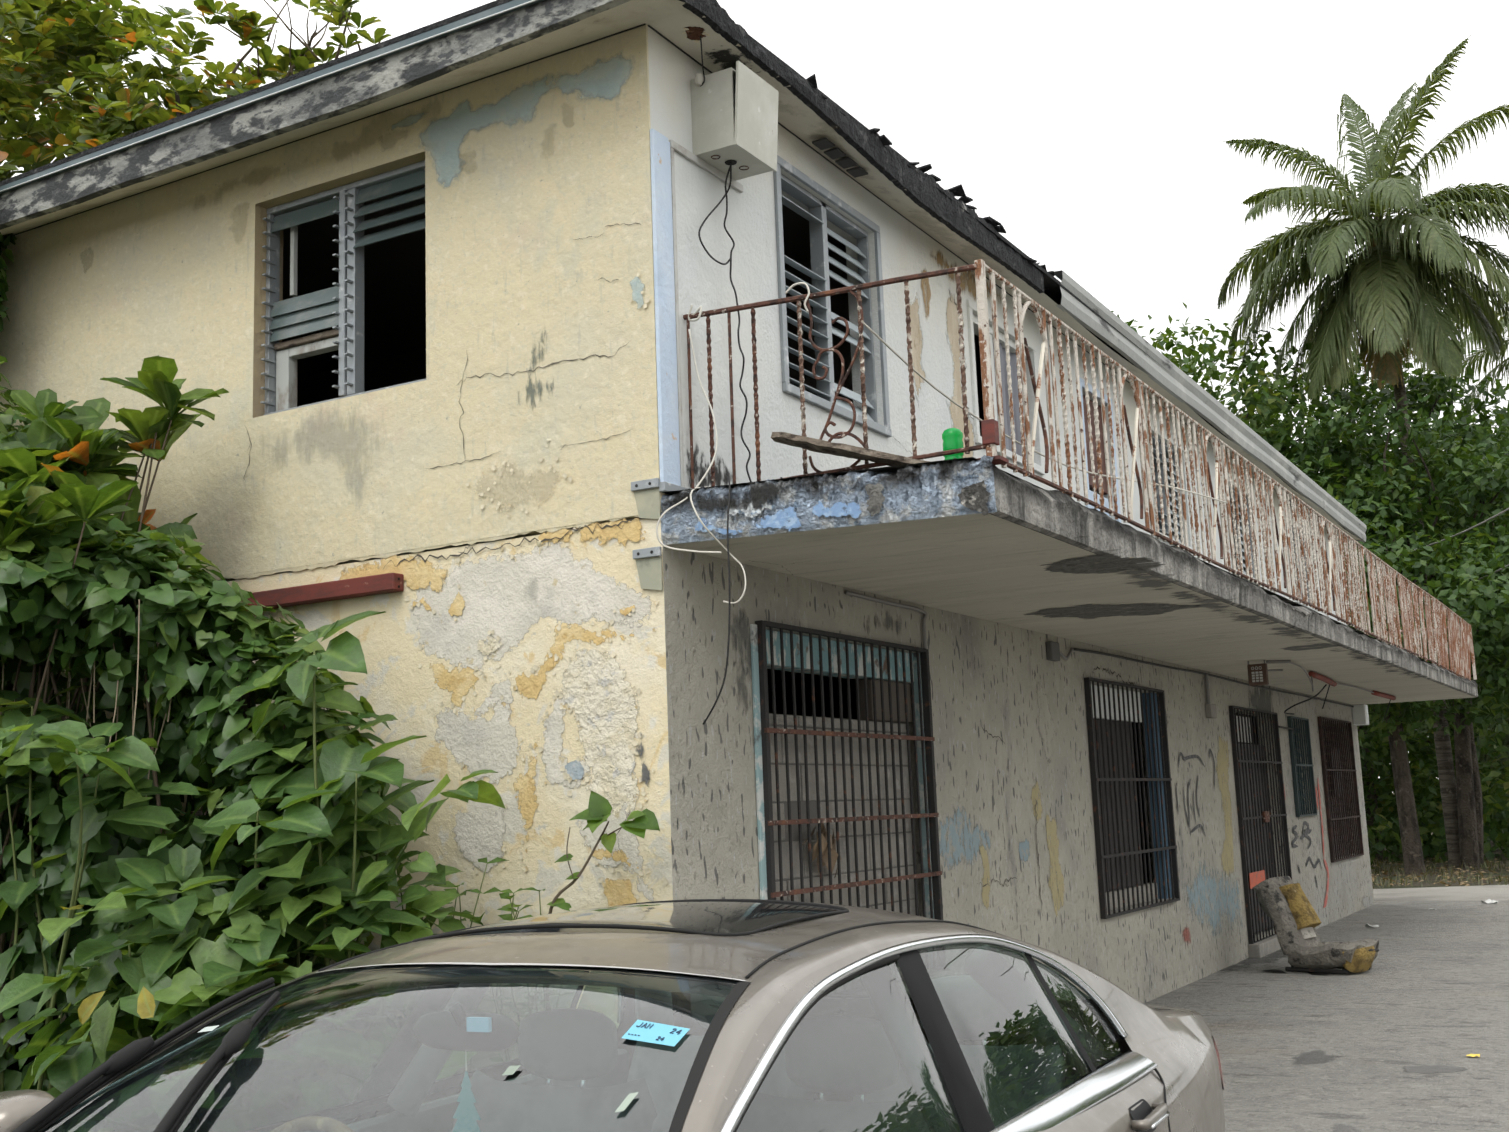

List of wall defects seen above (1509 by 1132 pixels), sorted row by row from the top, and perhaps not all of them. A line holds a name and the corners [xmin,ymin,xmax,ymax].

peeling [392,57,632,186]
rust [921,270,931,316]
crack [426,342,629,469]
peeling [694,483,885,535]
spalling [958,481,990,515]
peeling [339,518,668,906]